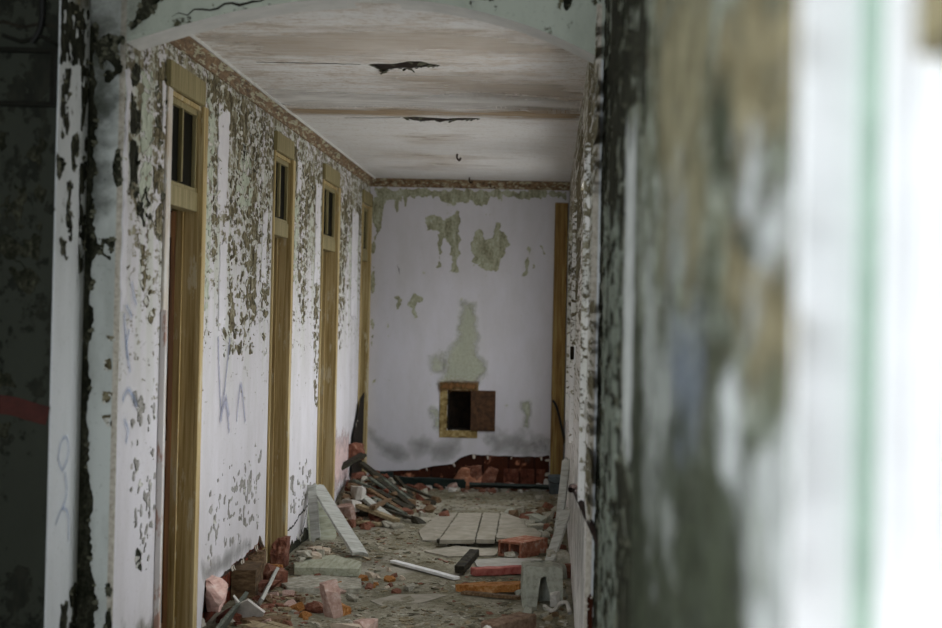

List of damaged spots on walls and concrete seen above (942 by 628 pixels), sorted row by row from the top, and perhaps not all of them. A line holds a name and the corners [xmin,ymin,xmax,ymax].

crack [173,0,263,16]
peeling [56,0,168,628]
peeling [204,70,273,357]
peeling [293,137,322,407]
peeling [338,0,806,628]
peeling [201,443,264,628]
flaking render [289,527,308,554]
peeling [290,459,311,515]